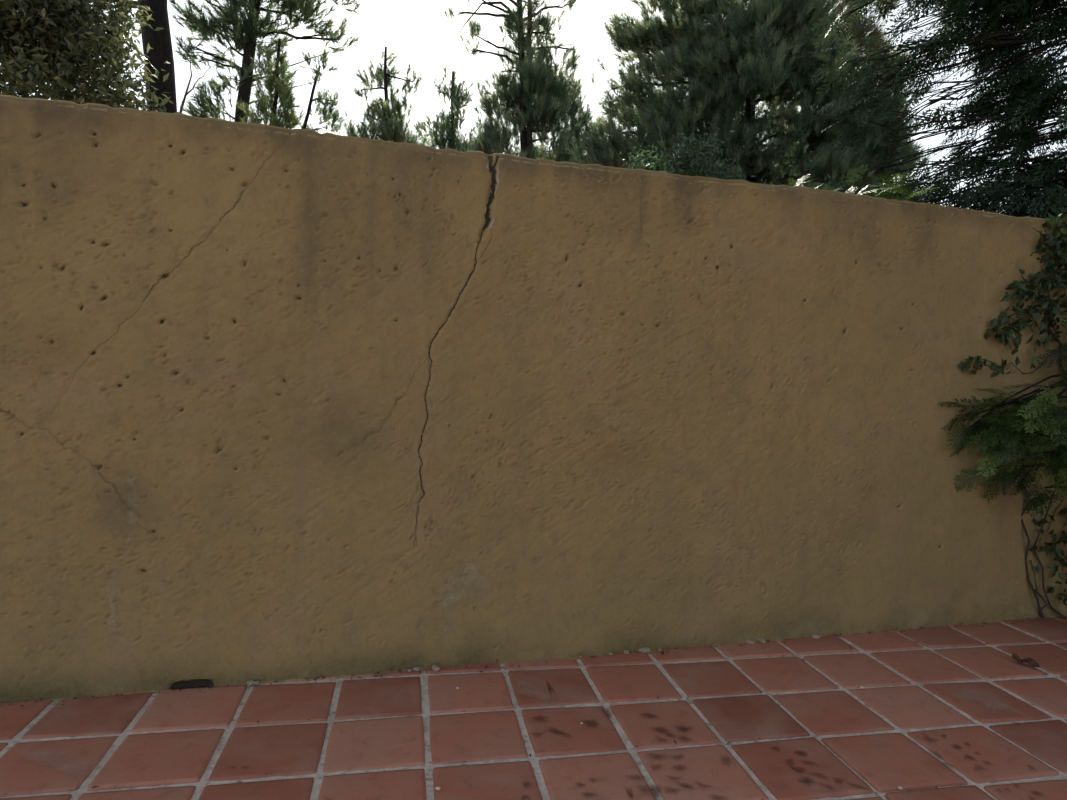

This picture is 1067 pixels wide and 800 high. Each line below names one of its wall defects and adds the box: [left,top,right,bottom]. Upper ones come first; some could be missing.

crack [415,156,500,544]